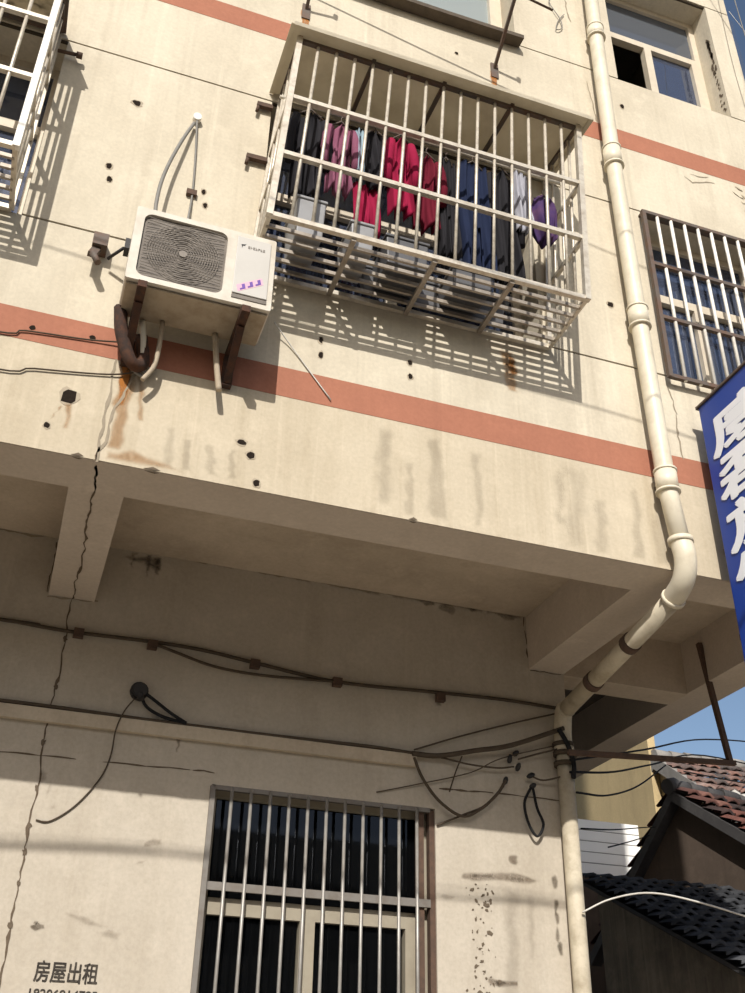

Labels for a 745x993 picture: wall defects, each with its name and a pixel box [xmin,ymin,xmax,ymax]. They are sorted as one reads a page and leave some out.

rust [119,367,130,415]
crack [0,359,137,986]
crack [109,762,214,773]
peeling [466,883,502,993]